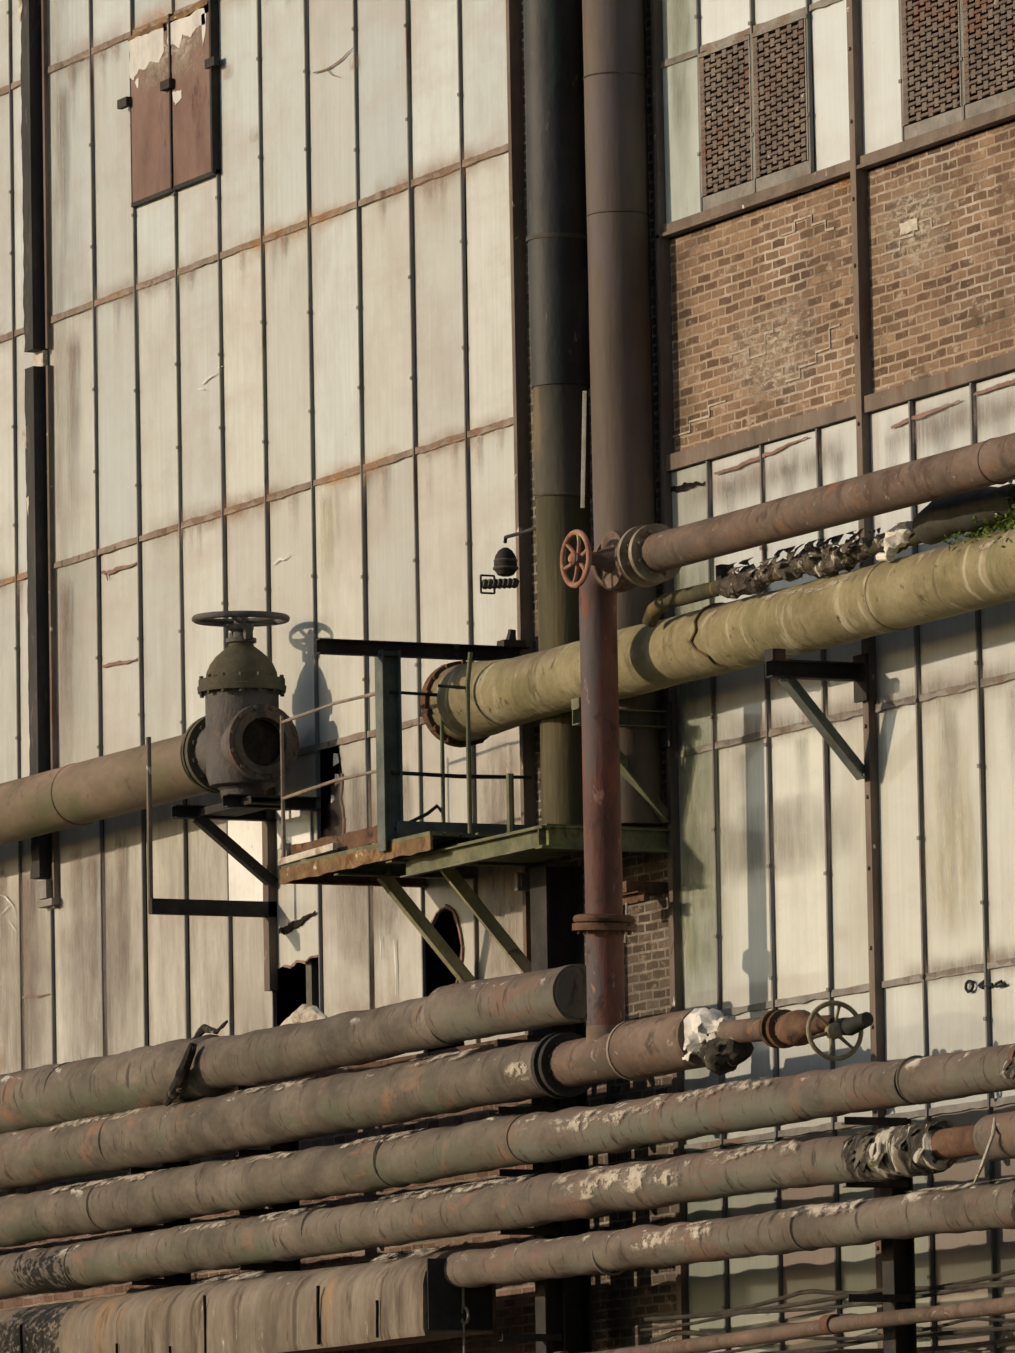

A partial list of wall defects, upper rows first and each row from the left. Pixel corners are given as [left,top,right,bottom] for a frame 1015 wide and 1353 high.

peeling [128,0,208,88]
peeling [172,90,182,106]